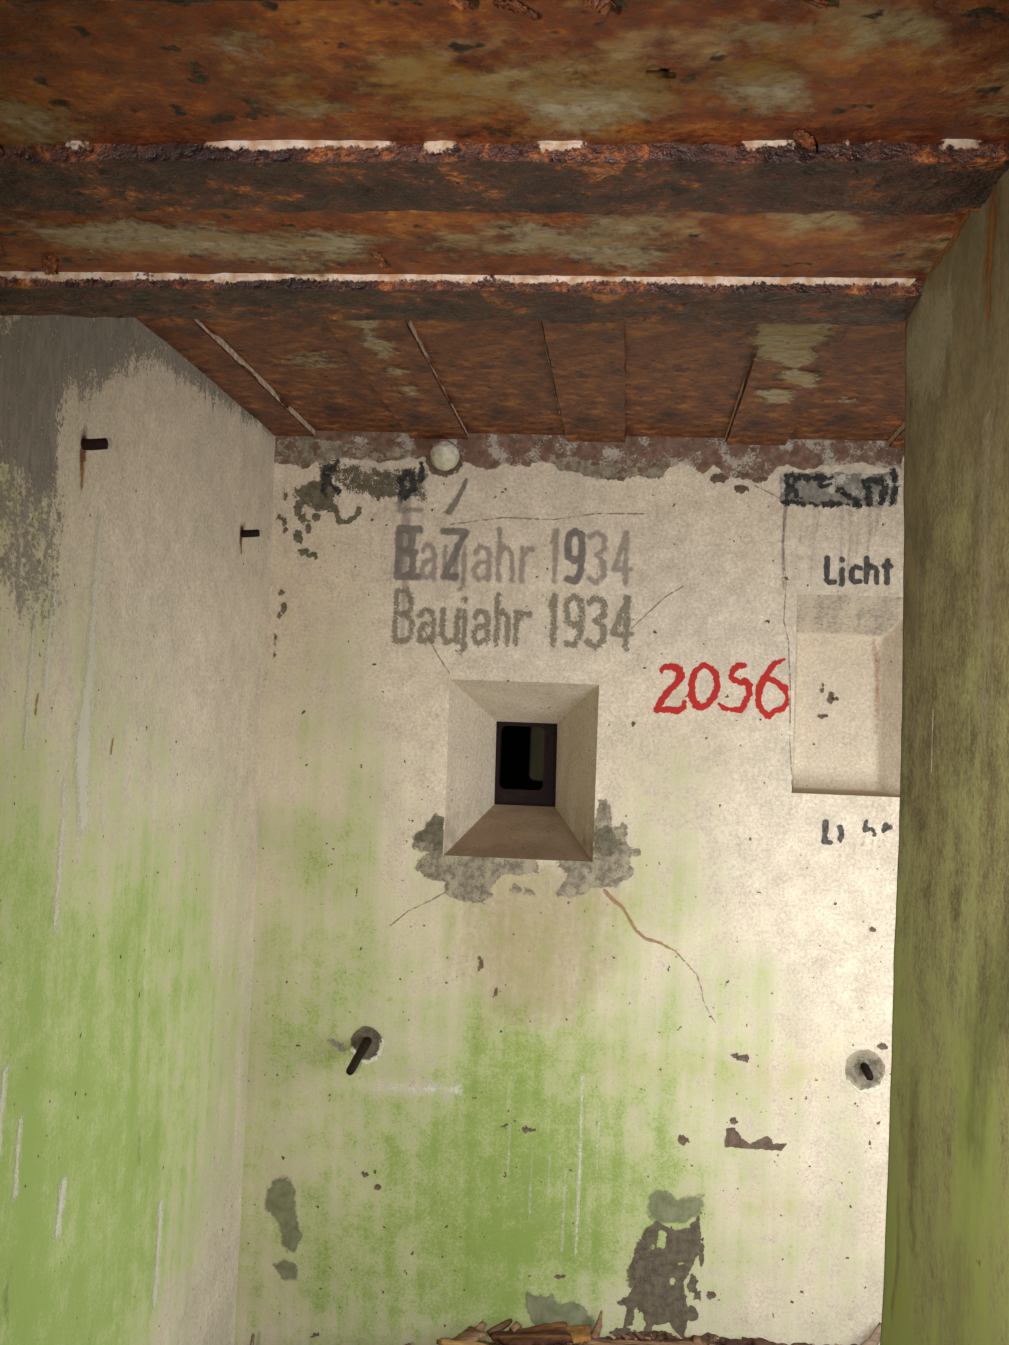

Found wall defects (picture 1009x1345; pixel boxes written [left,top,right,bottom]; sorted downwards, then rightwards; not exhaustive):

peeling [274,431,904,494]
water stain [52,519,103,931]
spalling [412,813,539,904]
spalling [556,799,641,899]
crack [603,889,715,1022]
water stain [0,1064,23,1197]
water stain [55,1177,67,1239]
water stain [152,1200,163,1308]
water stain [266,1178,302,1280]
water stain [561,1076,598,1254]
spalling [526,1190,705,1337]